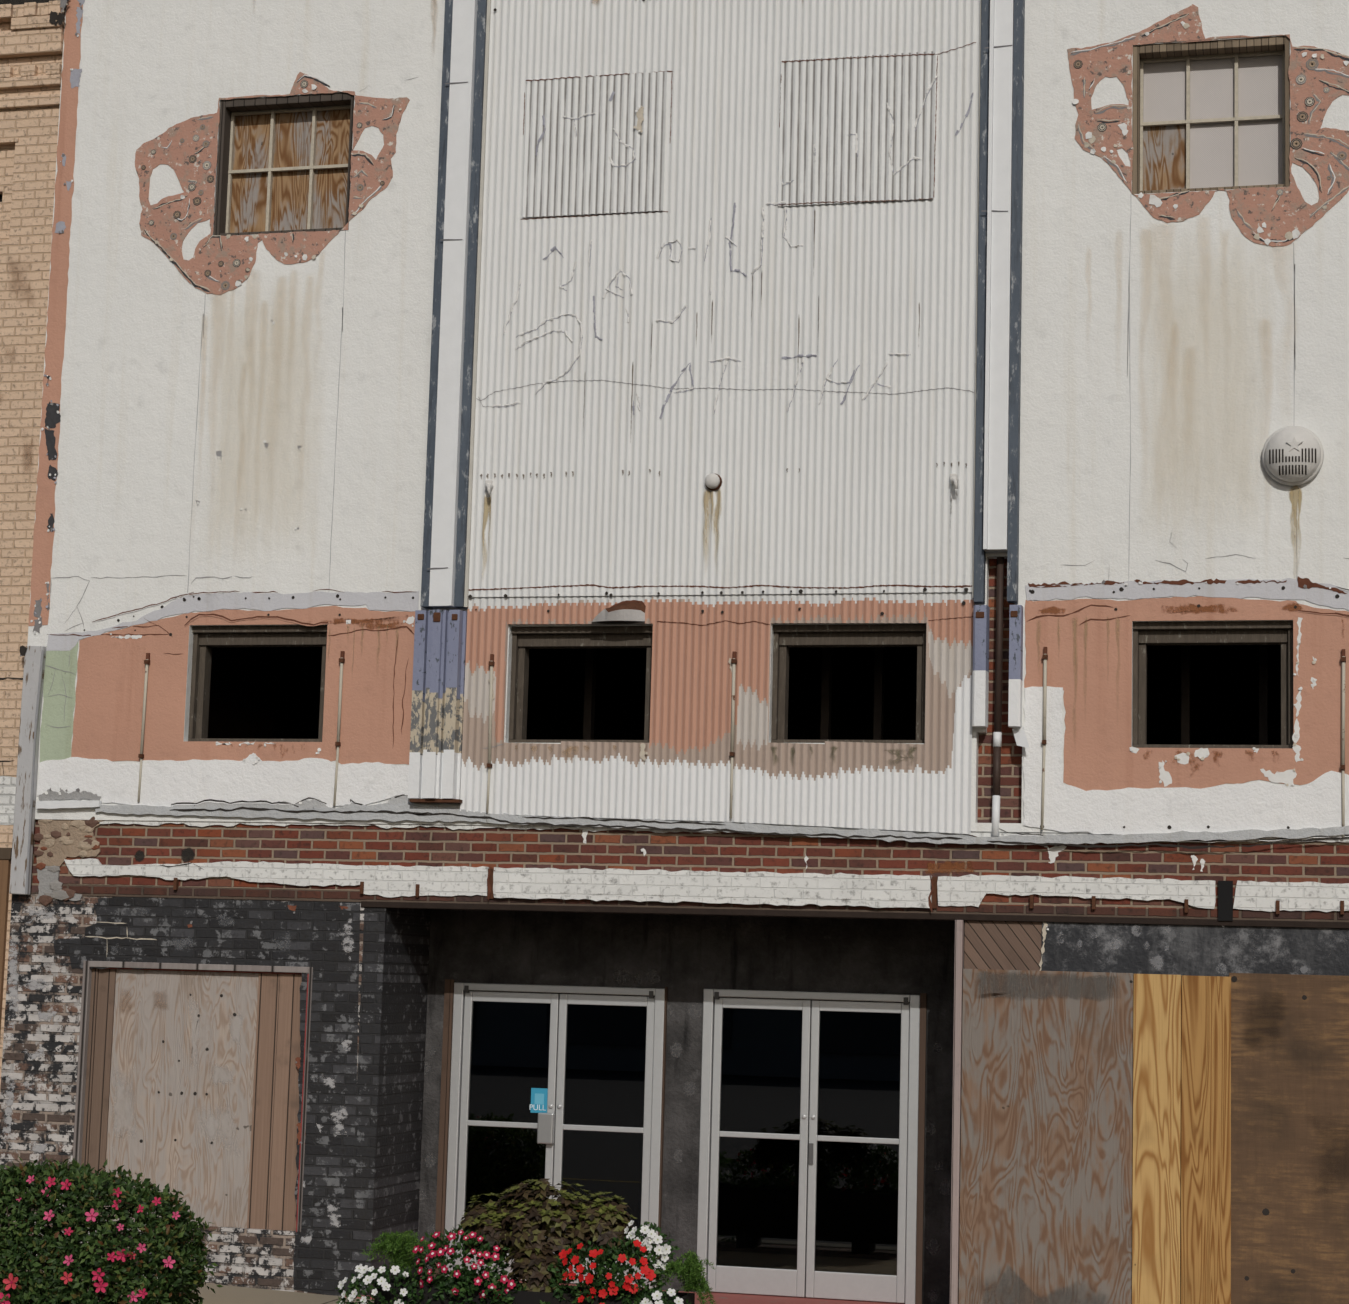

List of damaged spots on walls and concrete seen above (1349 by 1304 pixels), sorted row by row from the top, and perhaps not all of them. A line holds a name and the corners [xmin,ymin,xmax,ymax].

peeling [41,374,61,484]
rust [704,473,722,542]
rust [1290,486,1301,527]
peeling [1028,577,1347,594]
peeling [1260,617,1317,786]
peeling [216,742,274,764]
peeling [1159,748,1209,787]